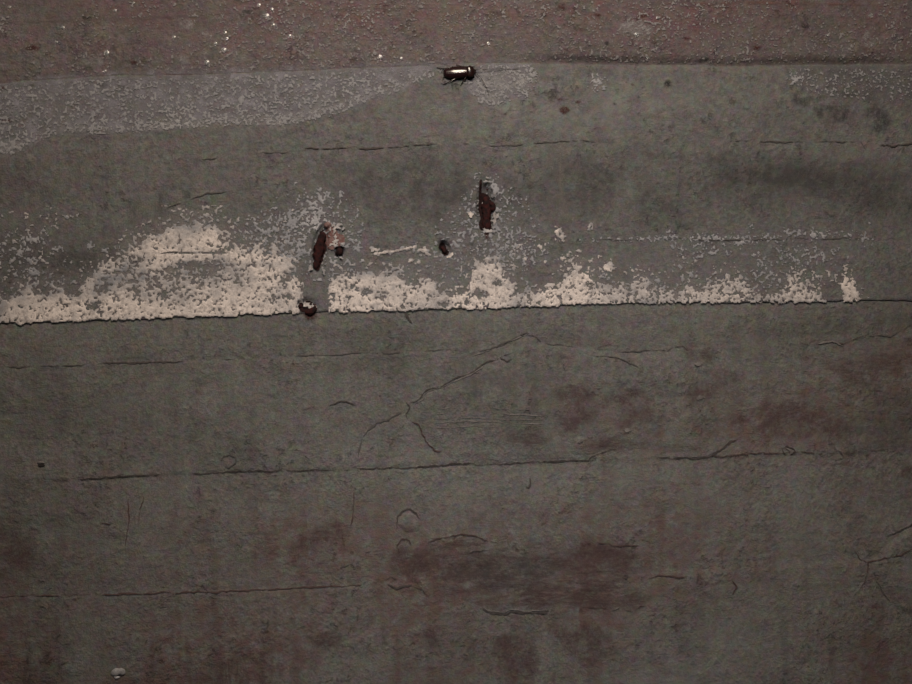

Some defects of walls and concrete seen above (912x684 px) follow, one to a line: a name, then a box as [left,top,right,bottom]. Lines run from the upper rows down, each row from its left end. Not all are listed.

damp [0,231,64,280]
damp [234,182,365,281]
damp [434,172,548,280]
damp [592,222,874,288]
crack [5,360,181,368]
crack [192,332,633,488]
crack [656,440,884,460]
crack [68,474,160,545]
crack [856,524,912,612]